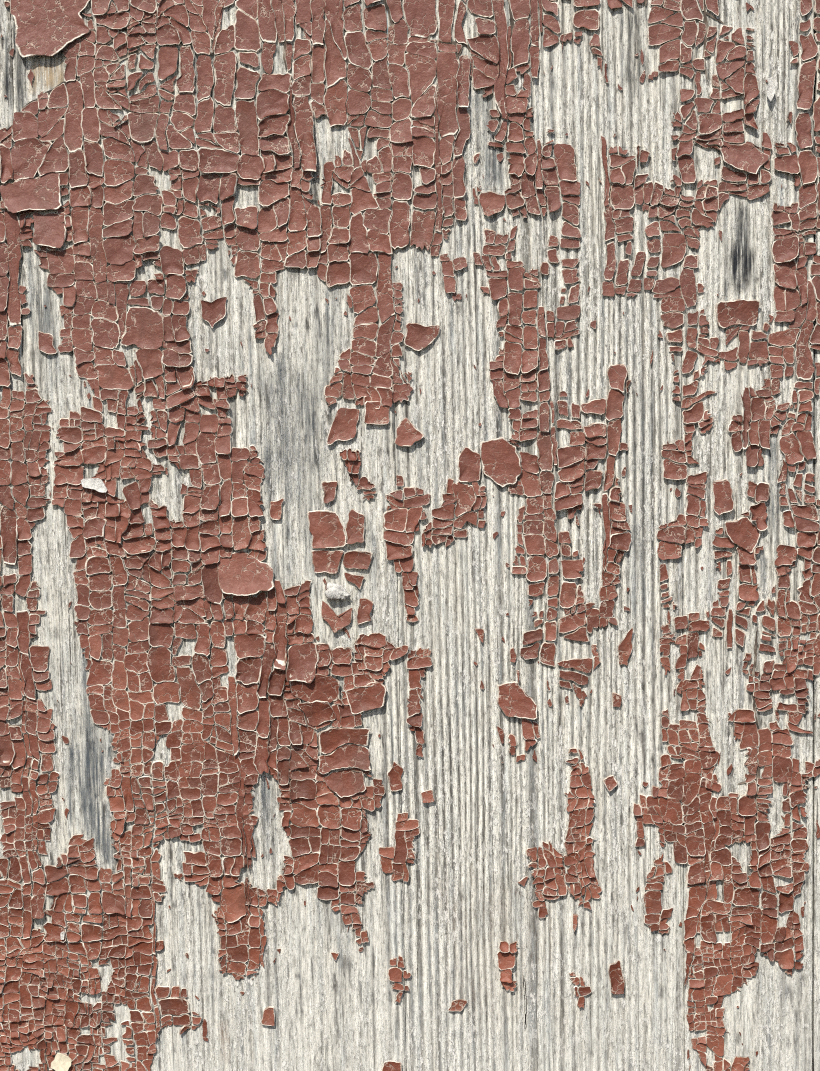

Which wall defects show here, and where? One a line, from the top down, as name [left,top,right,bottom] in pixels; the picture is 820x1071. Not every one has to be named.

peeling [0,0,90,142]
crack [22,1,159,109]
crack [384,0,478,59]
crack [507,0,515,68]
crack [702,0,724,80]
peeling [132,150,199,218]
peeling [0,172,201,948]
peeling [162,6,820,1071]
crack [9,652,40,868]
crack [737,628,760,833]
peeling [64,657,405,1071]
peeling [0,1032,72,1071]